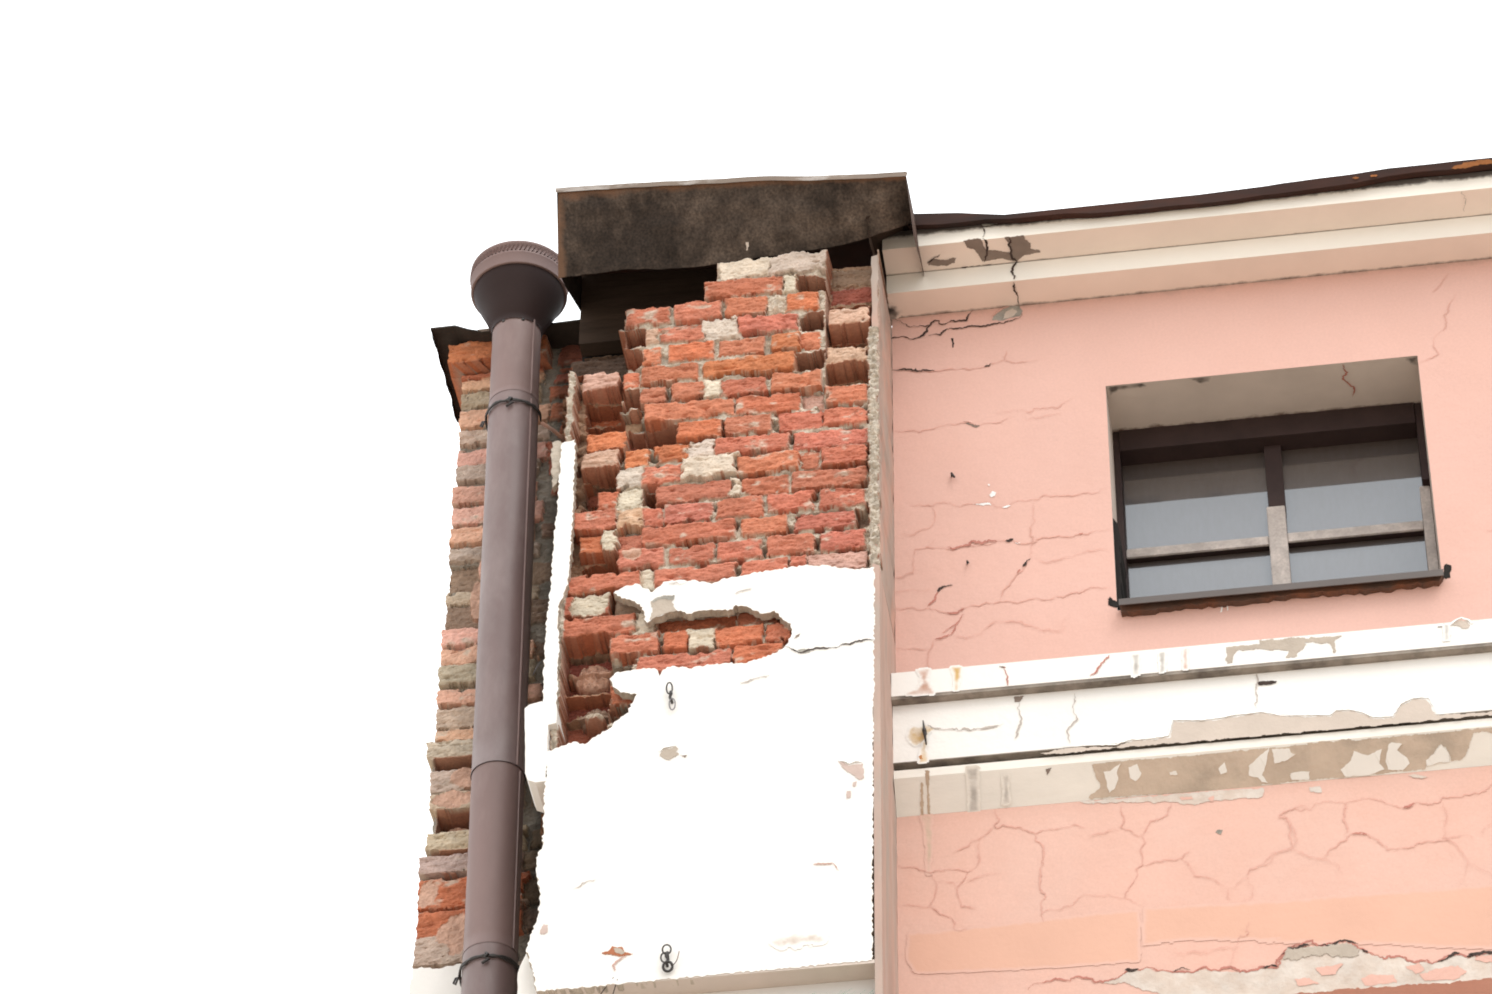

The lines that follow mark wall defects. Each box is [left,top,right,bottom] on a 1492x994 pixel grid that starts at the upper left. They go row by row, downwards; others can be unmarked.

corrosion [1451,159,1492,169]
crack [891,224,1026,372]
peeling [928,235,1040,266]
spalling [650,595,676,620]
crack [740,487,1110,683]
peeling [1041,696,1492,805]
crack [901,787,1492,989]
spalling [1104,942,1492,994]